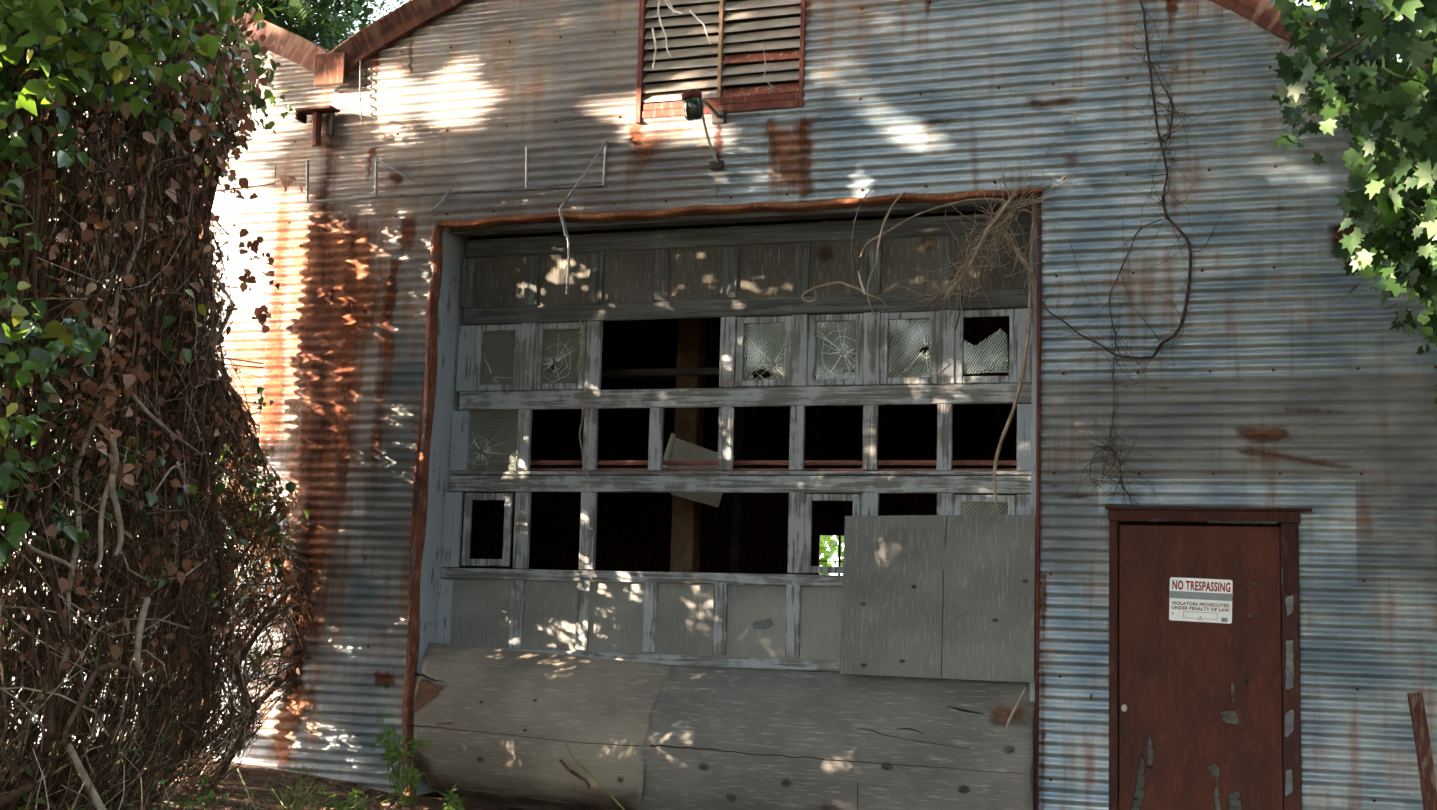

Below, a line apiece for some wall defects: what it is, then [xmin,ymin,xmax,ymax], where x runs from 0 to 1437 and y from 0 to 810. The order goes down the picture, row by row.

corrosion [629,124,658,166]
corrosion [768,118,813,197]
corrosion [229,128,416,766]
corrosion [1237,428,1336,467]
peeling [1131,734,1154,810]
peeling [1207,763,1242,810]